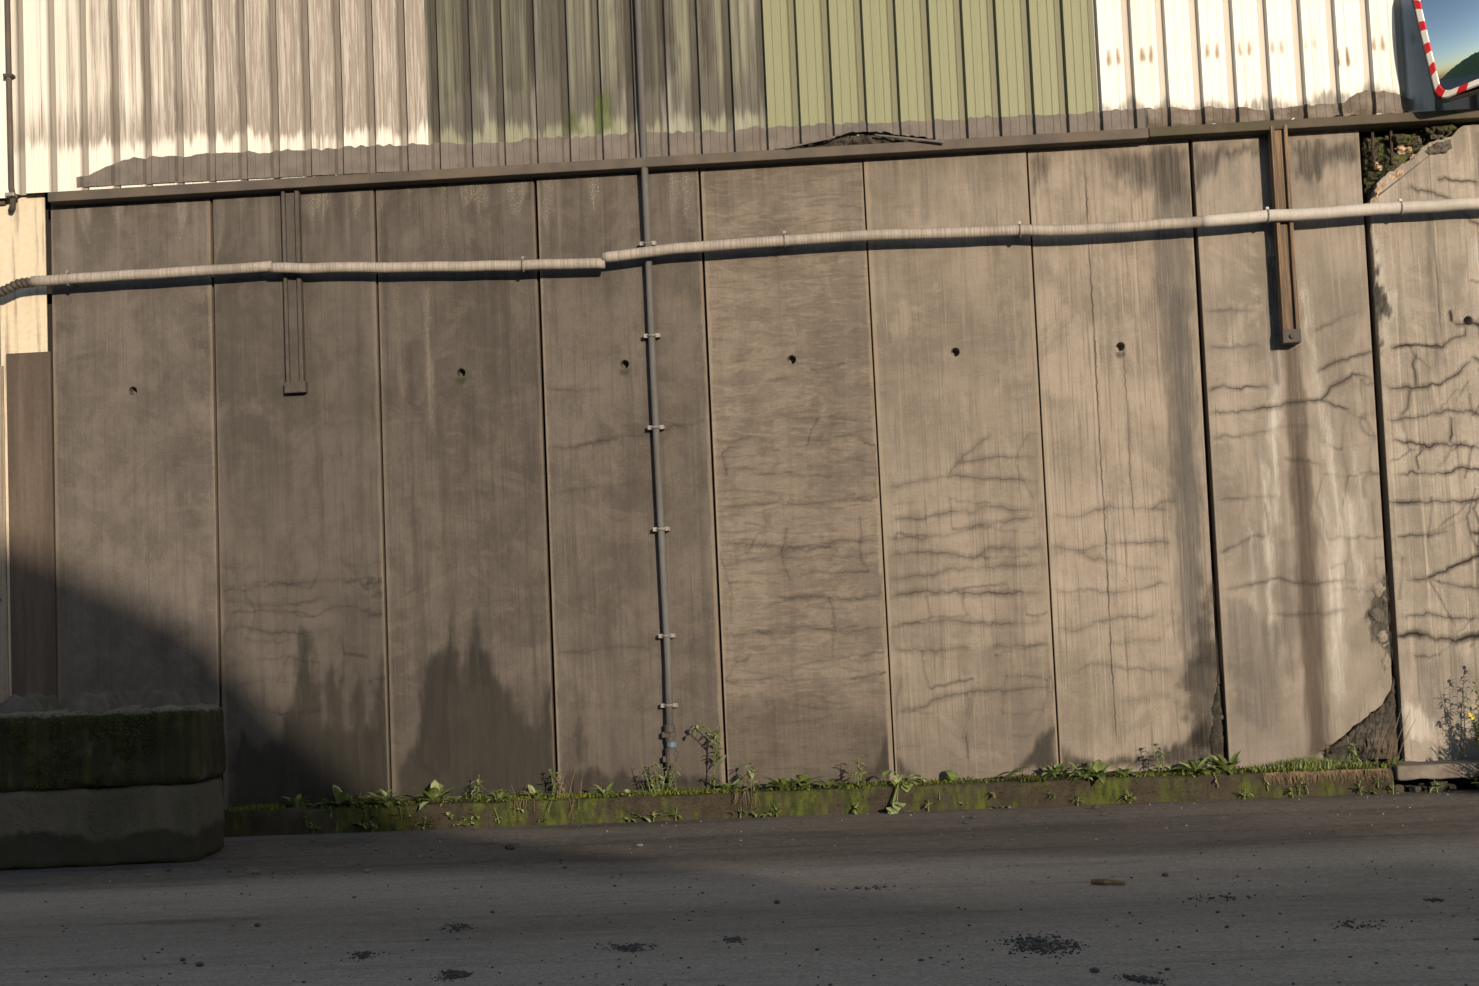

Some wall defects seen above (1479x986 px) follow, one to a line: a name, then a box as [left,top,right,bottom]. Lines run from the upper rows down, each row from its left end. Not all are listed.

spalling [1362,124,1457,202]
crack [1414,177,1479,224]
leakage [1111,152,1220,767]
efflorescence [1251,340,1280,625]
crack [1213,356,1360,414]
efflorescence [1315,375,1364,692]
crack [1394,310,1479,587]
leakage [234,628,719,807]
spalling [1323,577,1401,762]
crack [1398,631,1479,643]